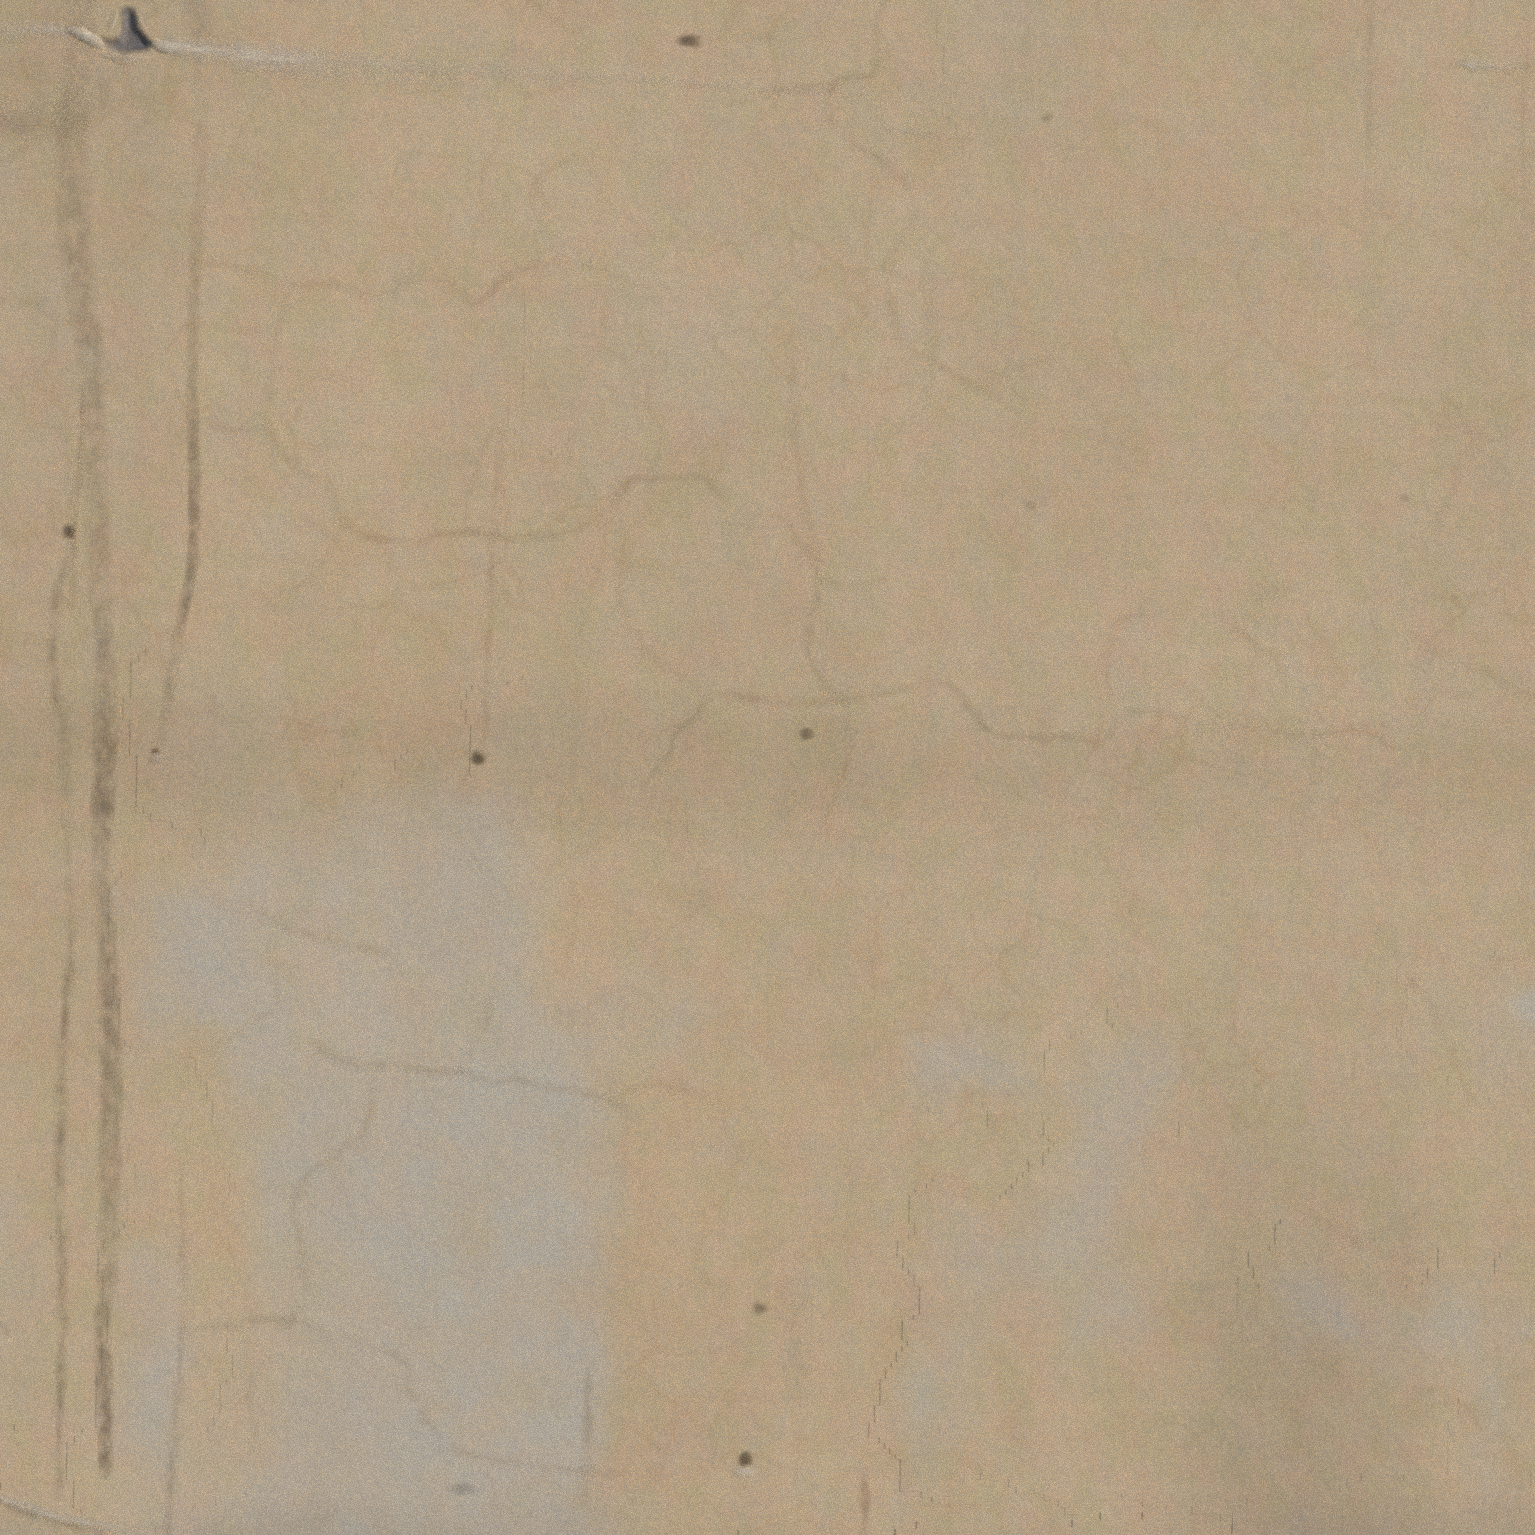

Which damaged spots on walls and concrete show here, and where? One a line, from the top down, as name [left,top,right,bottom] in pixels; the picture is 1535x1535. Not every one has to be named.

leakage [0,817,93,1179]
crack [0,1496,127,1532]